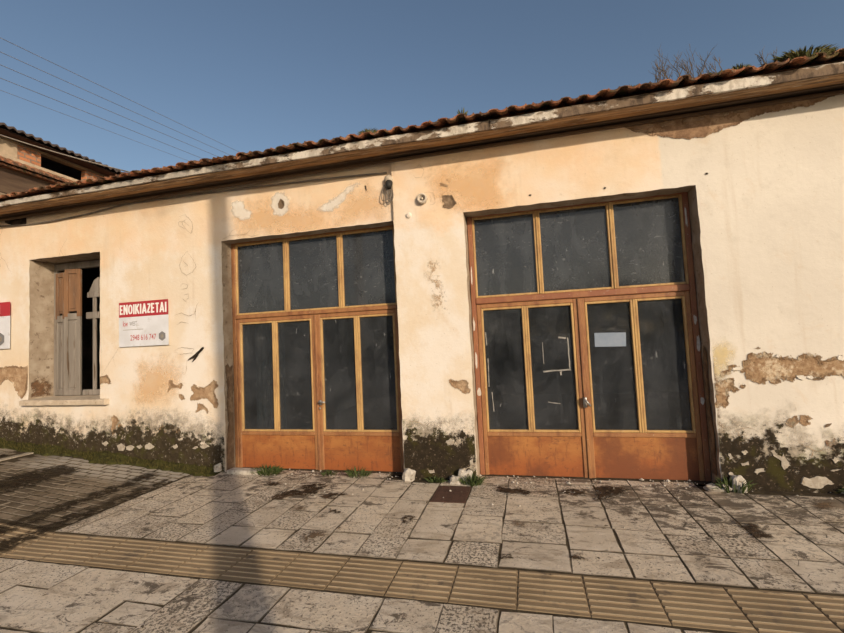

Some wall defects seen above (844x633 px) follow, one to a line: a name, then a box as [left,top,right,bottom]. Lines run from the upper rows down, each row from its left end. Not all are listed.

spalling [440,179,456,209]
spalling [0,365,28,399]
water stain [0,411,225,472]
spalling [167,364,235,470]
water stain [402,420,477,481]
spalling [449,379,481,396]
spalling [697,335,844,475]
water stain [717,410,844,494]